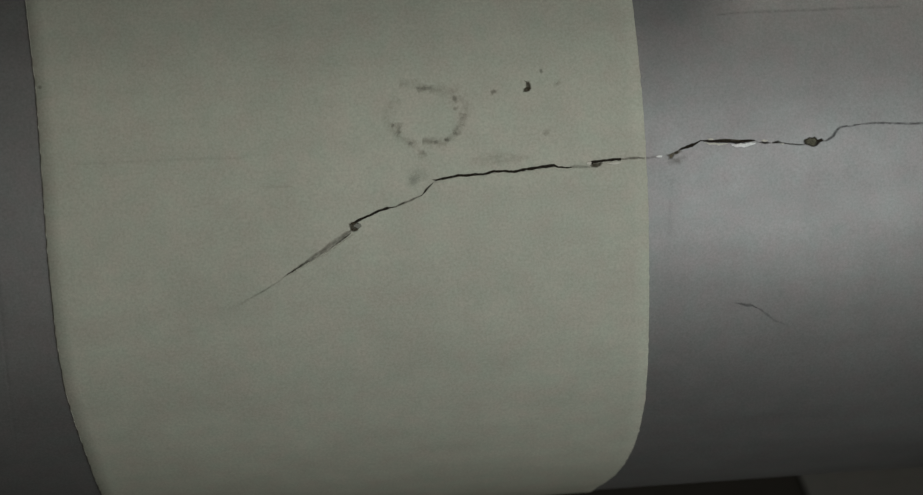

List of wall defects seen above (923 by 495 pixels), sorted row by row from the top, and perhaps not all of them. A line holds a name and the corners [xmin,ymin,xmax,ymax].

crack [656,122,919,159]
crack [290,158,623,275]